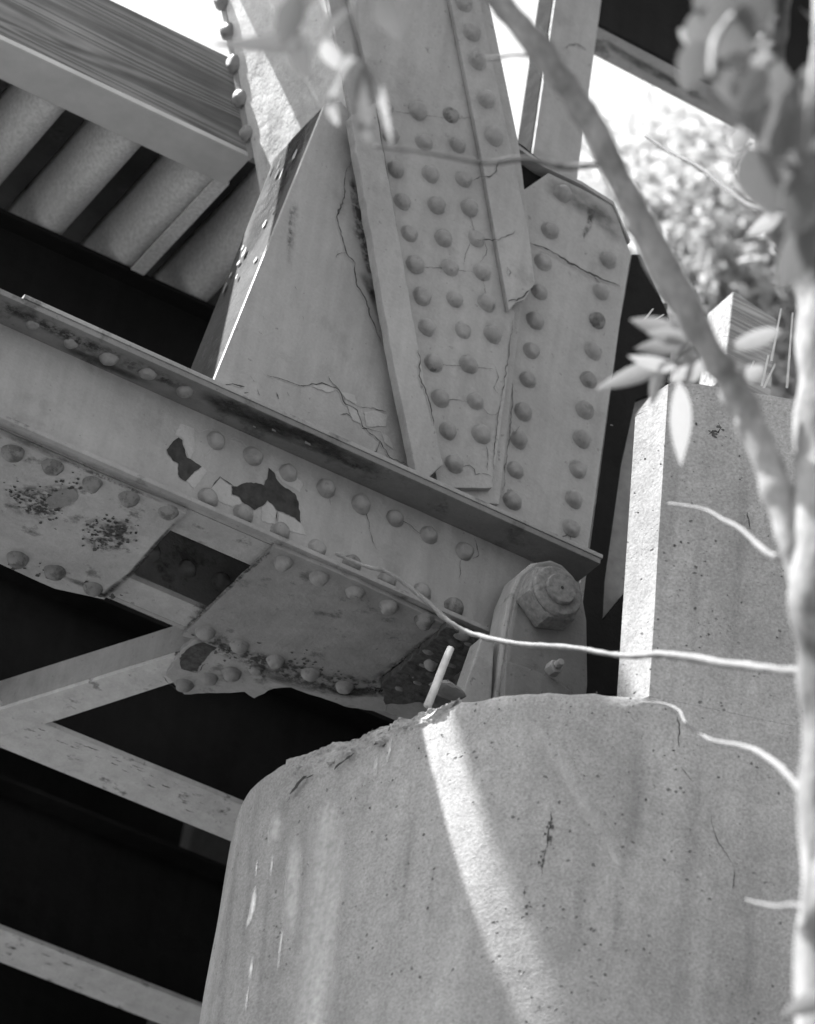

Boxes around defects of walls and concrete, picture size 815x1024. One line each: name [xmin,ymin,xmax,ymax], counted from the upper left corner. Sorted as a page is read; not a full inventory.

crack [426,220,619,293]
crack [268,376,408,466]
crack [443,321,519,487]
corrosion [3,458,109,530]
peeling [167,424,306,535]
corrosion [82,514,139,551]
peeling [179,642,217,673]